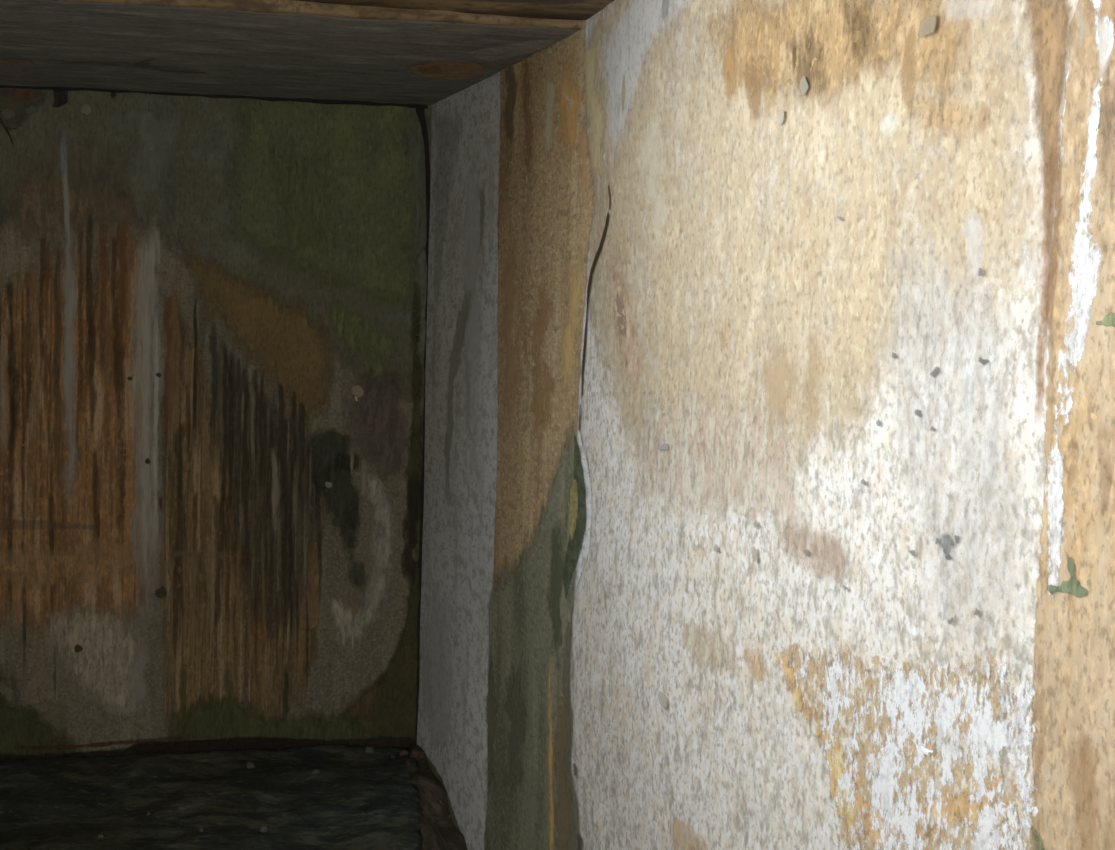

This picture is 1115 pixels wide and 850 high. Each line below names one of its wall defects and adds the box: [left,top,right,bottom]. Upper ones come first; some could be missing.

leakage [0,85,460,635]
leakage [486,663,525,783]
leakage [548,529,582,850]
crack [578,185,611,431]
spalling [773,0,1115,850]
leakage [1047,0,1114,595]